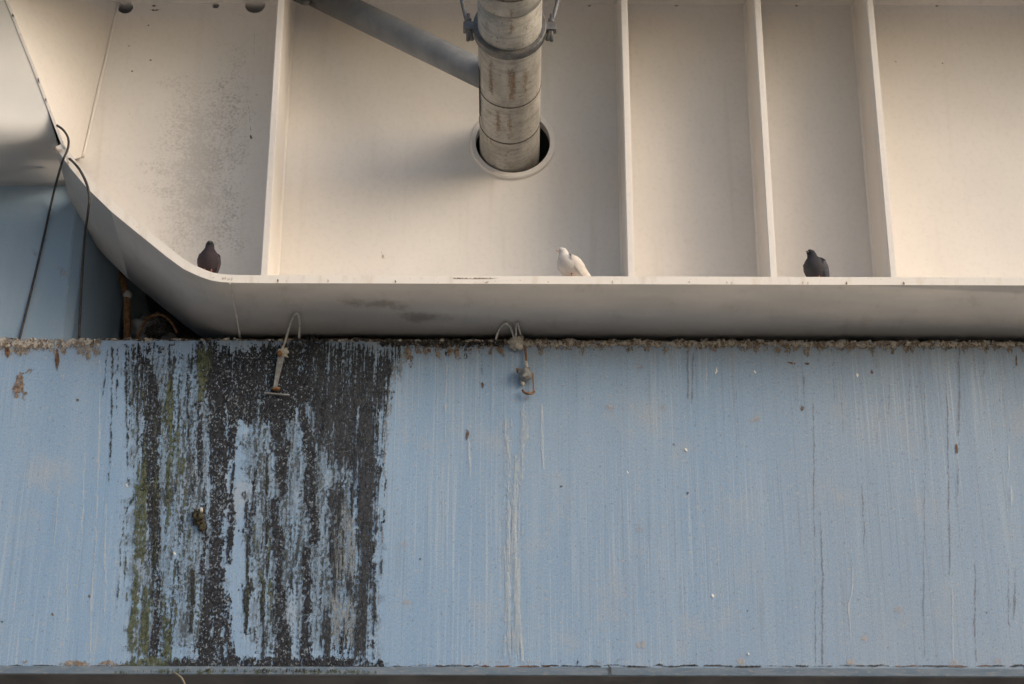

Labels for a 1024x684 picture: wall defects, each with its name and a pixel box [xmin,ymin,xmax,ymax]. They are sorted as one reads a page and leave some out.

water stain [103,334,405,667]